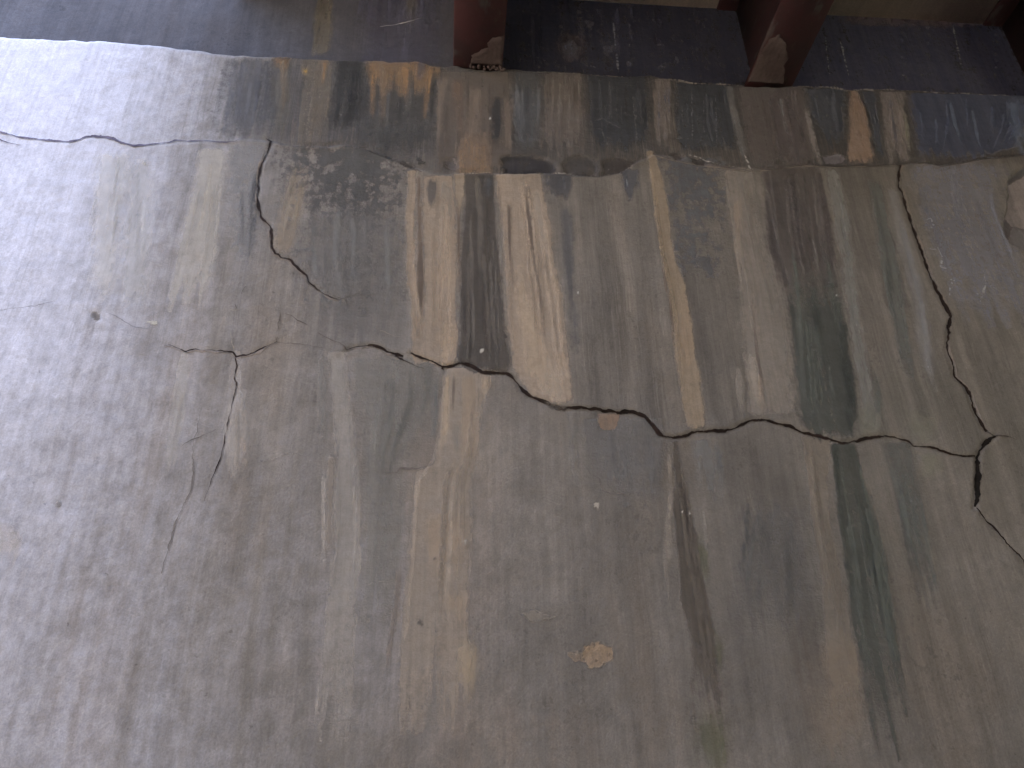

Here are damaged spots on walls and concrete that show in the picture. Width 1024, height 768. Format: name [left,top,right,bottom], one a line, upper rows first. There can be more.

crack [0,131,376,310]
crack [107,156,1024,574]
damp [502,0,877,429]
damp [792,15,1024,162]
peeling [583,642,613,668]
damp [584,419,722,714]